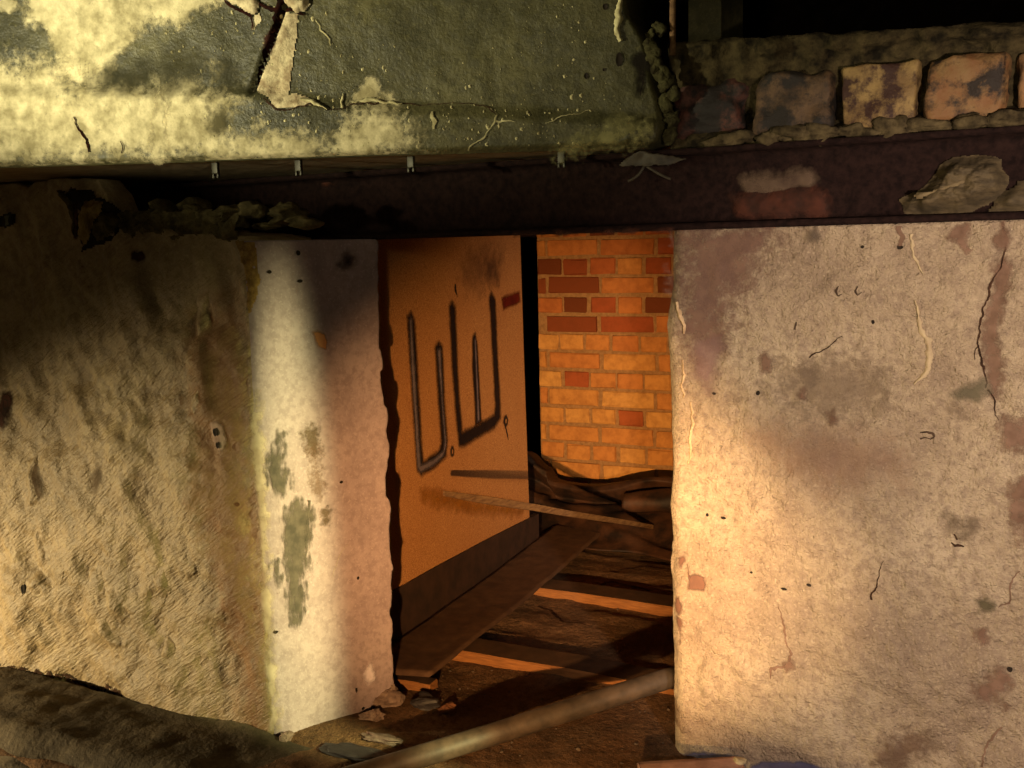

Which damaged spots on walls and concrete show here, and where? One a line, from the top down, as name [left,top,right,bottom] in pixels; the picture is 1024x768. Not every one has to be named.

peeling [0,0,420,167]
crack [224,0,514,151]
crack [73,117,89,152]
spalling [56,187,121,252]
corrosion [729,169,832,219]
crack [974,224,1012,420]
damp [265,423,330,626]
peeling [679,556,706,591]
crack [870,562,883,600]